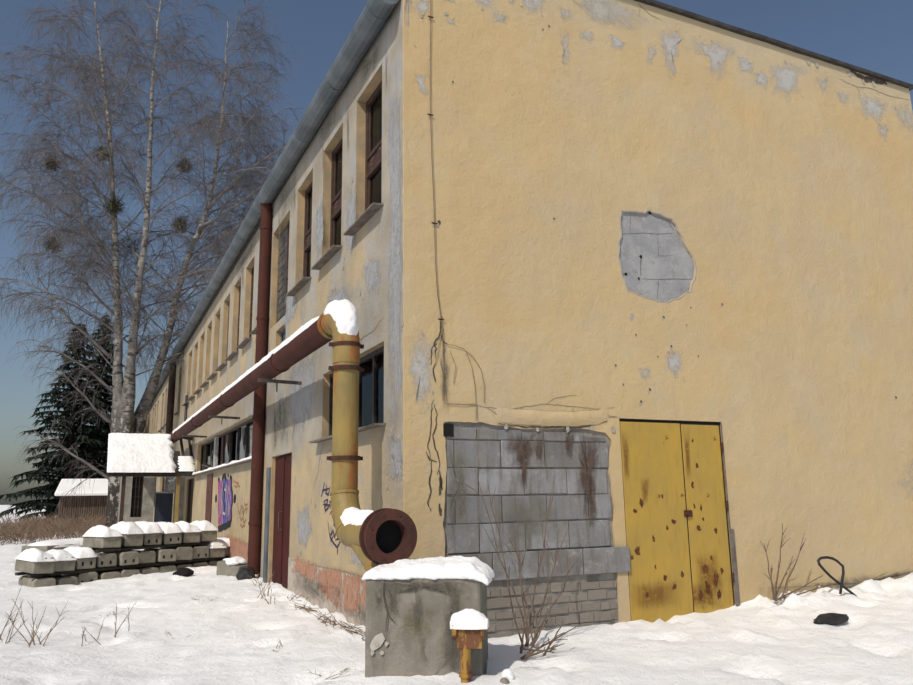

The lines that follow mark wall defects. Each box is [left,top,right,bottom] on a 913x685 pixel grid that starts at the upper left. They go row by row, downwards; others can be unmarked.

peeling [740,57,797,91]
flaking render [848,70,887,87]
flaking render [618,209,697,304]
spalling [443,423,454,437]
crack [426,322,618,516]
peeling [294,499,366,613]
rust [646,565,684,601]
rust [692,557,724,602]